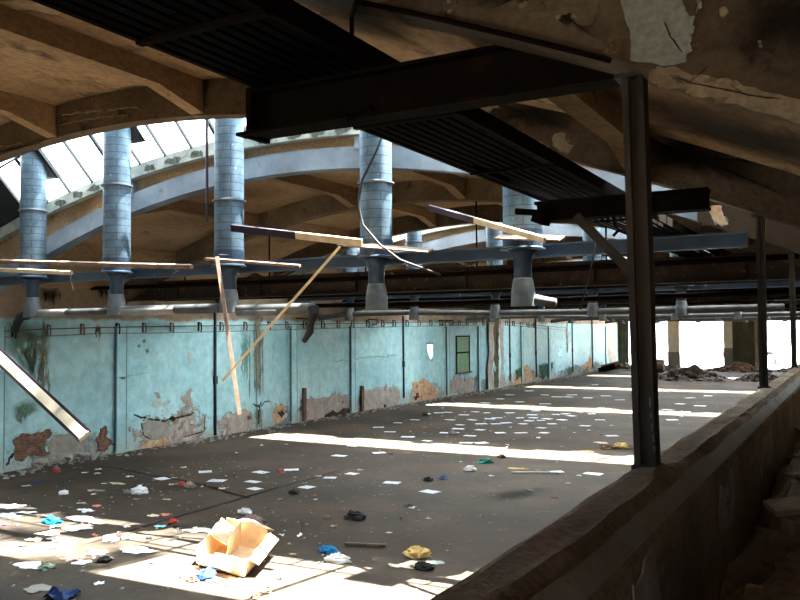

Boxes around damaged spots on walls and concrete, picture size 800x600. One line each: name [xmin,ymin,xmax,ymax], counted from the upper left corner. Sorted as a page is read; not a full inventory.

crack [664,22,682,52]
spalling [648,66,800,125]
crack [670,66,780,99]
spalling [540,132,575,155]
spalling [709,205,729,227]
damp [13,324,50,392]
damp [241,316,263,396]
peeling [299,320,542,422]
spalling [6,425,115,465]
crack [134,412,205,439]
peeling [128,387,255,449]
spalling [273,403,288,426]